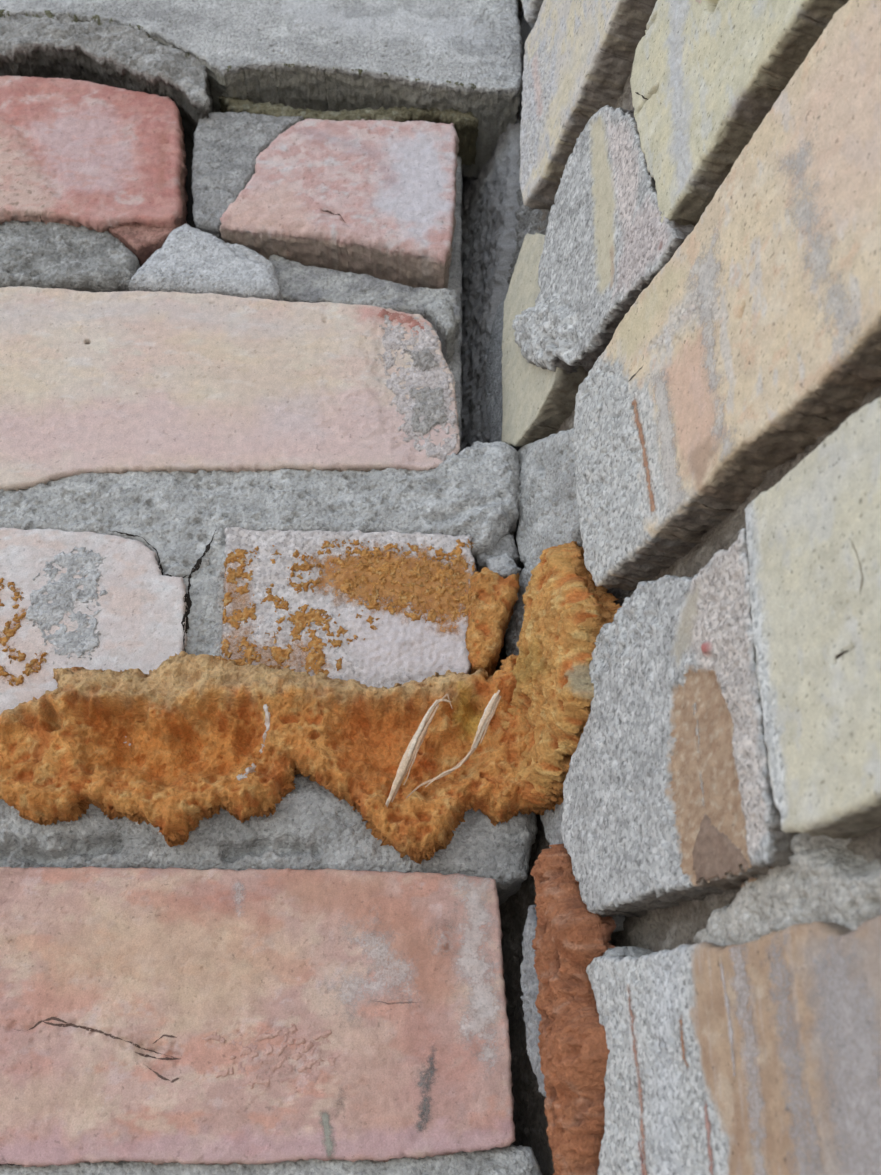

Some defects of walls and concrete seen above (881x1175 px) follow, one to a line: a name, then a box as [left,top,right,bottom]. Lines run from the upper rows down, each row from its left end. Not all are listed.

spalling [375,315,460,464]
spalling [26,546,109,664]
crack [108,530,216,652]
crack [29,1017,180,1083]